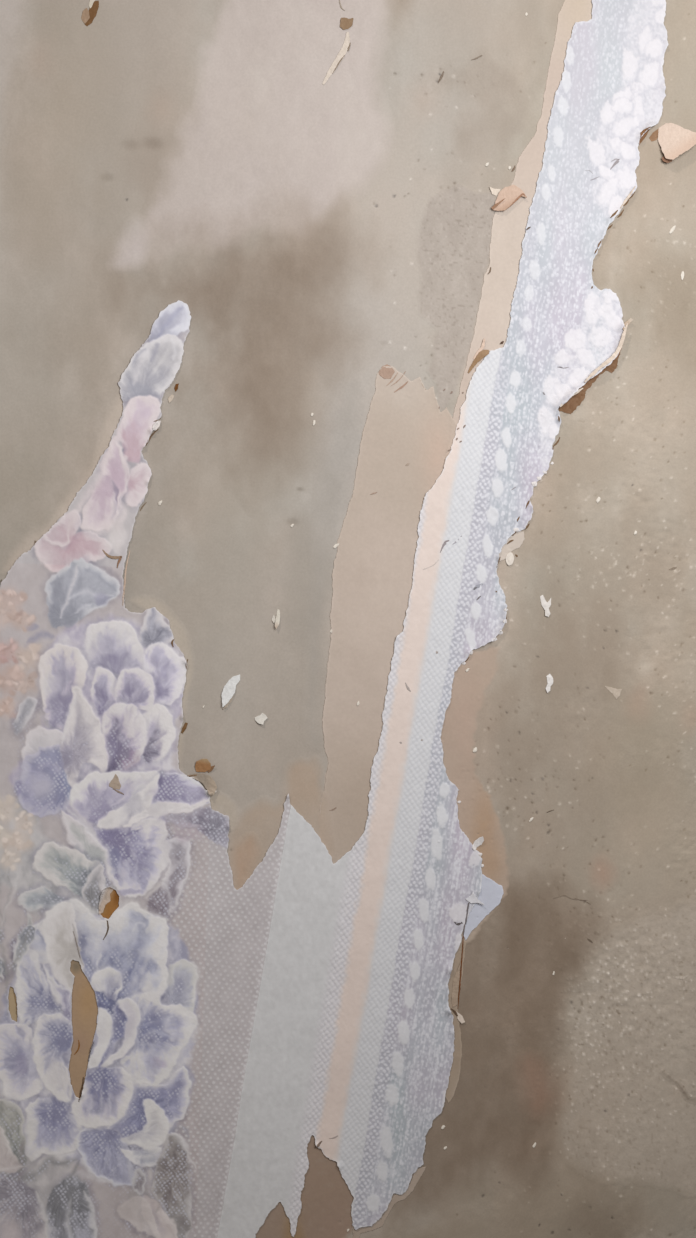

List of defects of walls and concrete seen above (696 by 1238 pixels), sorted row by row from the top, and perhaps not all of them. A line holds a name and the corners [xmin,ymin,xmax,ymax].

damp [92,0,419,890]
peeling [187,759,217,796]
peeling [221,675,240,709]
damp [382,846,659,1238]